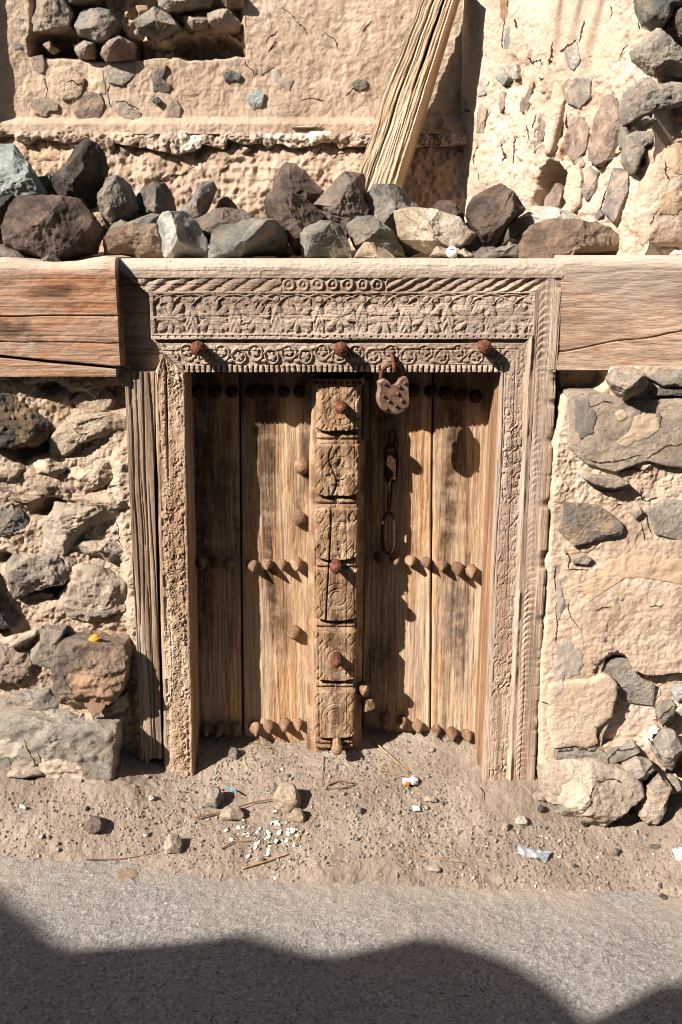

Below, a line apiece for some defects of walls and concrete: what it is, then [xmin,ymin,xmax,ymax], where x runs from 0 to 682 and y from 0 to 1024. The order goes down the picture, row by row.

crack [244,6,339,75]